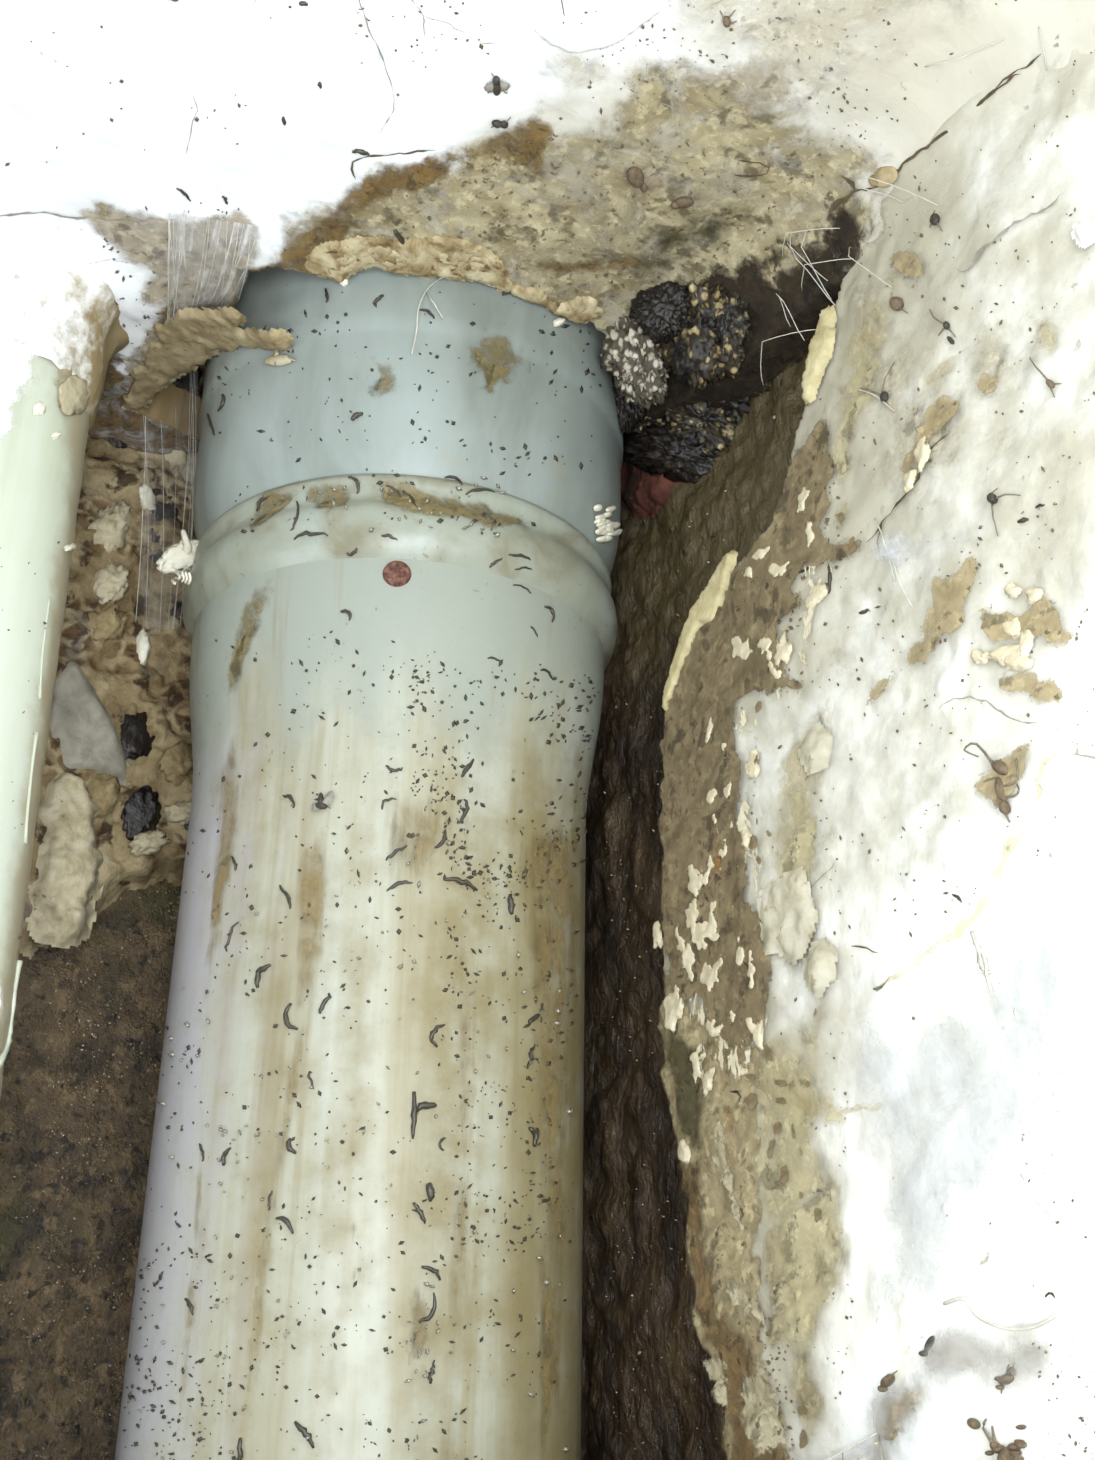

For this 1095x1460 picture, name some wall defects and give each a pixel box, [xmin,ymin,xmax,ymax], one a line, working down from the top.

crack [976,54,1041,107]
flaking render [305,233,606,324]
leakage [276,0,892,484]
crack [827,130,948,219]
leakage [832,301,949,479]
peeling [867,557,1074,705]
flaking render [581,296,861,1460]
leakage [777,745,816,882]